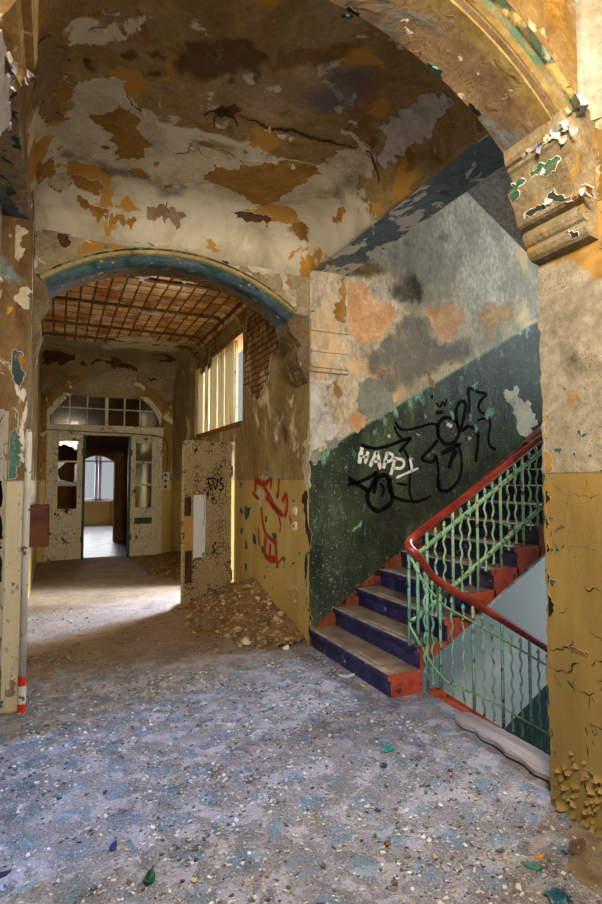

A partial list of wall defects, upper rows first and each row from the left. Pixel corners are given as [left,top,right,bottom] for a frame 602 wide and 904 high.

damp [151,39,268,84]
peeling [0,29,455,230]
crack [239,114,380,185]
peeling [509,85,592,201]
peeling [523,127,602,220]
peeling [0,174,72,268]
flaking render [292,221,310,242]
peeling [14,287,33,310]
flaking render [41,335,181,383]
flaking render [236,306,280,402]
flaking render [333,275,398,347]
crack [552,631,602,759]